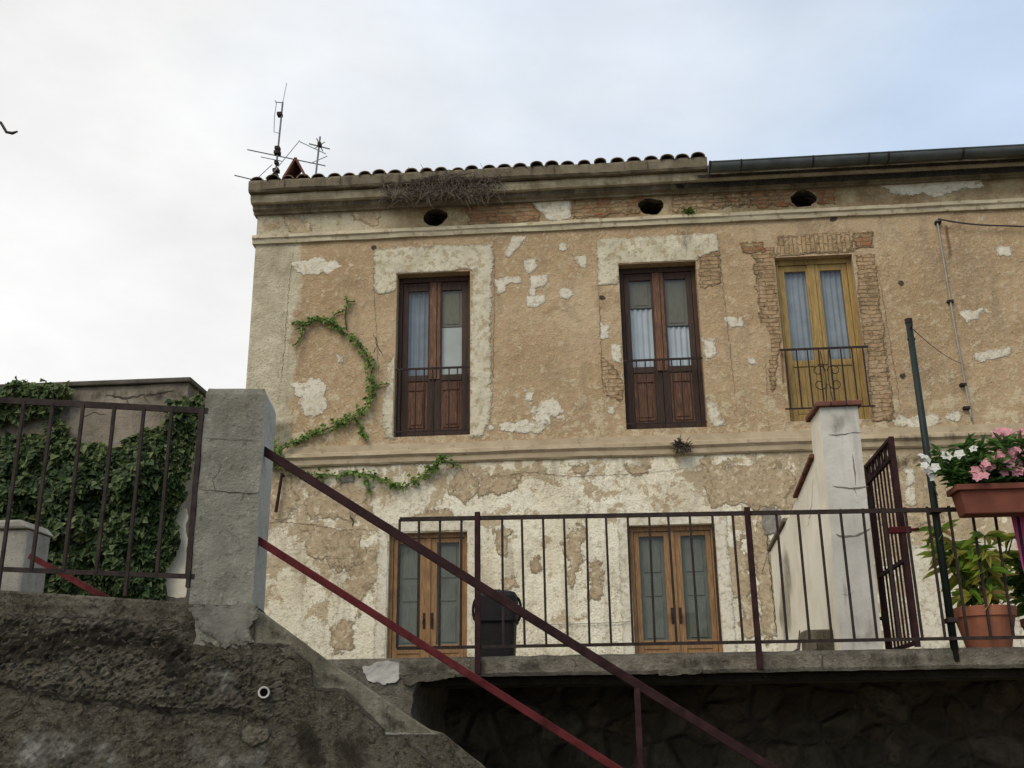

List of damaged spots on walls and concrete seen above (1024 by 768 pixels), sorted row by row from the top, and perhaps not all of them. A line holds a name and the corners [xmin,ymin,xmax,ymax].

flaking render [465,197,643,225]
peeling [879,180,984,198]
peeling [494,236,574,308]
flaking render [739,188,963,427]
crack [84,388,176,417]
peeling [290,377,329,417]
peeling [382,357,395,439]
peeling [487,390,566,434]
crack [205,438,258,500]
crack [807,432,868,526]
spalling [270,474,378,655]
spalling [699,457,796,647]